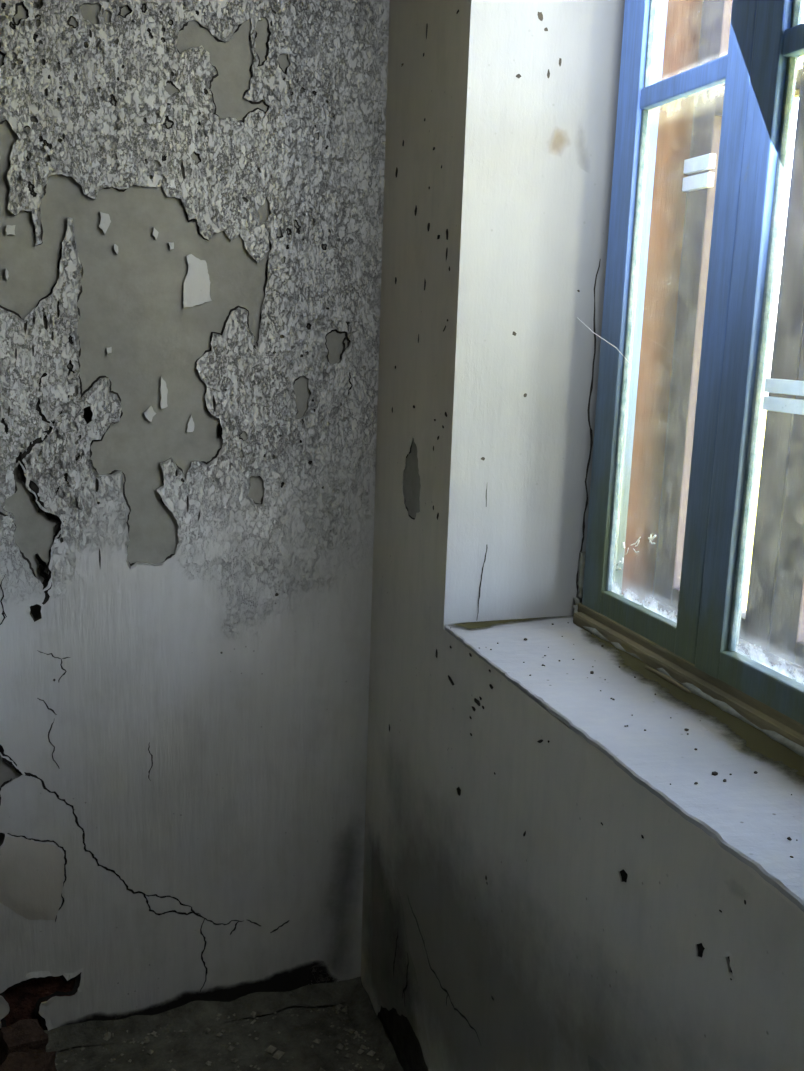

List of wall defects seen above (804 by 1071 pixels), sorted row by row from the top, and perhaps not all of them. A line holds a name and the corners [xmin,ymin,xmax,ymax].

peeling [0,0,353,624]
peeling [401,436,439,522]
peeling [0,752,25,808]
crack [0,650,290,992]